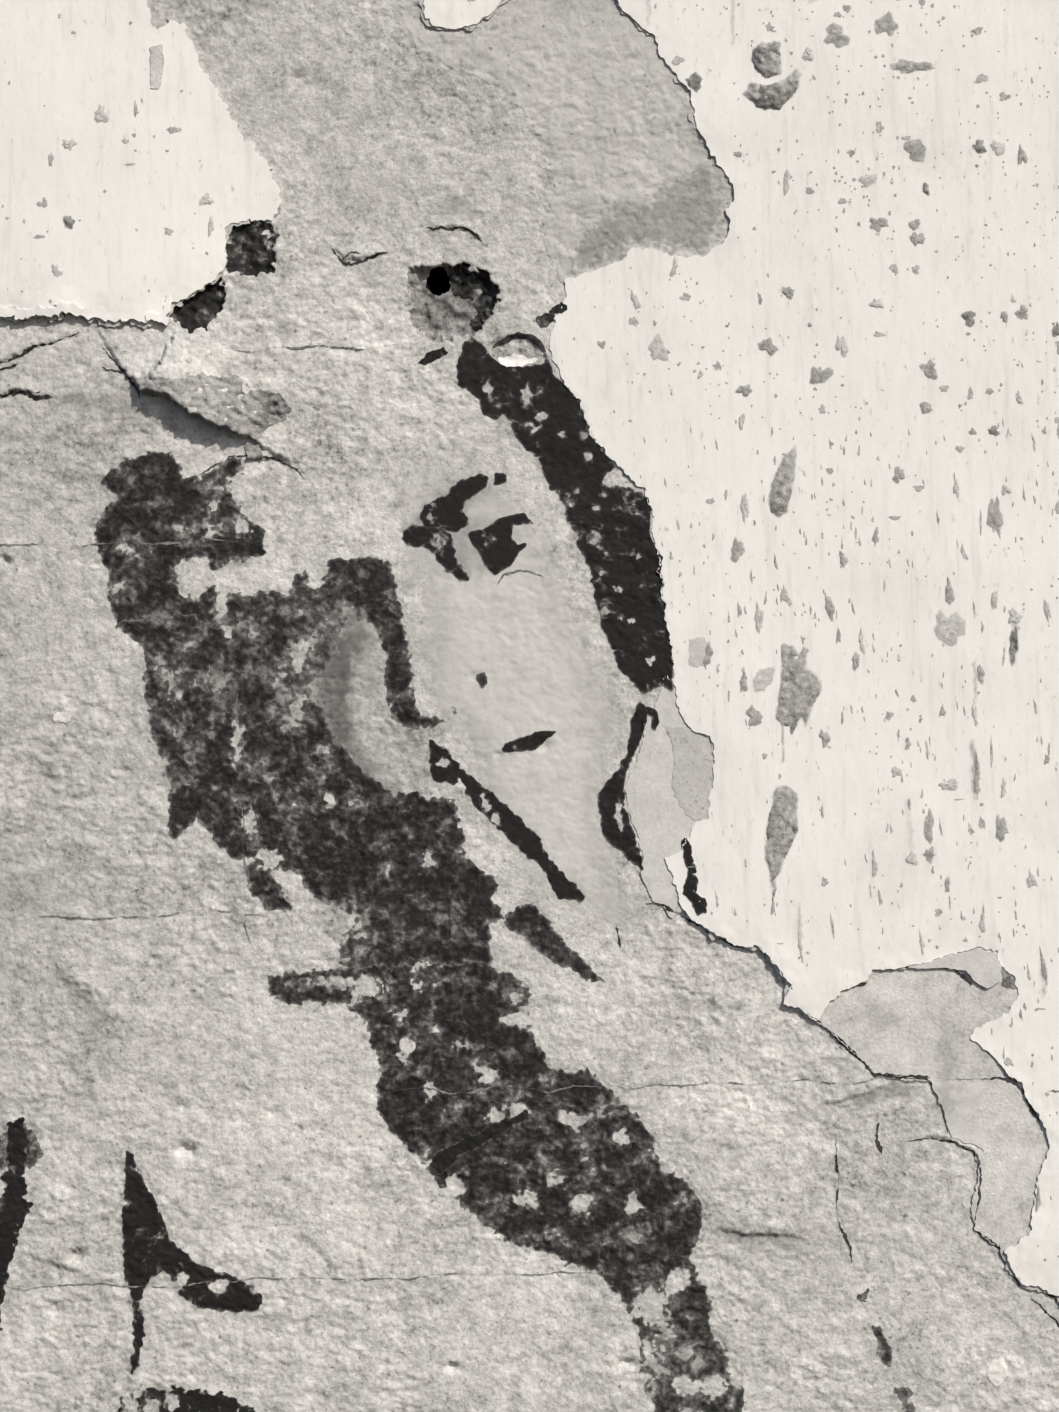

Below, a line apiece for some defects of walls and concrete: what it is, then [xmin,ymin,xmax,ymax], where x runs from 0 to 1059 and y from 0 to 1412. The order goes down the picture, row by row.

peeling [0,0,283,329]
peeling [397,0,734,283]
crack [0,332,140,401]
spalling [405,262,546,367]
peeling [689,637,708,667]
peeling [624,675,715,918]
crack [379,903,1059,1327]
peeling [814,946,1050,1247]